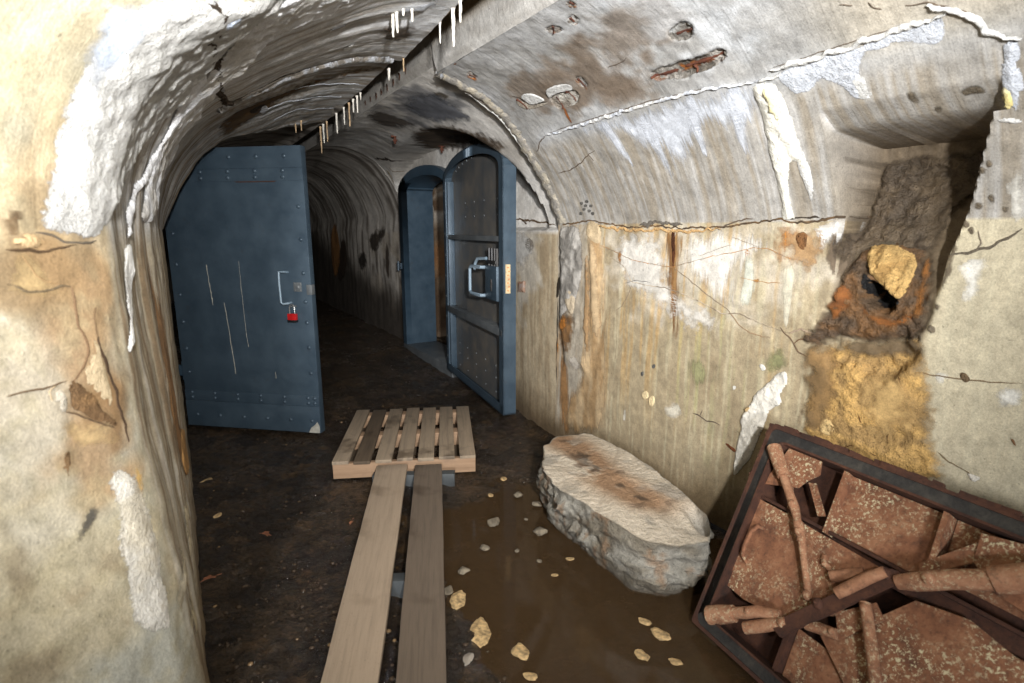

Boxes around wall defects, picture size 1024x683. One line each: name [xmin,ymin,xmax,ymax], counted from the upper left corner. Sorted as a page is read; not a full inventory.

spalling [513,76,587,123]
spalling [651,48,726,80]
leakage [779,18,945,99]
crack [7,210,129,442]
rust [667,232,682,329]
crack [516,215,872,357]
spalling [765,150,984,489]
crack [949,228,1023,255]
spalling [55,381,117,476]
peeling [958,490,1024,518]